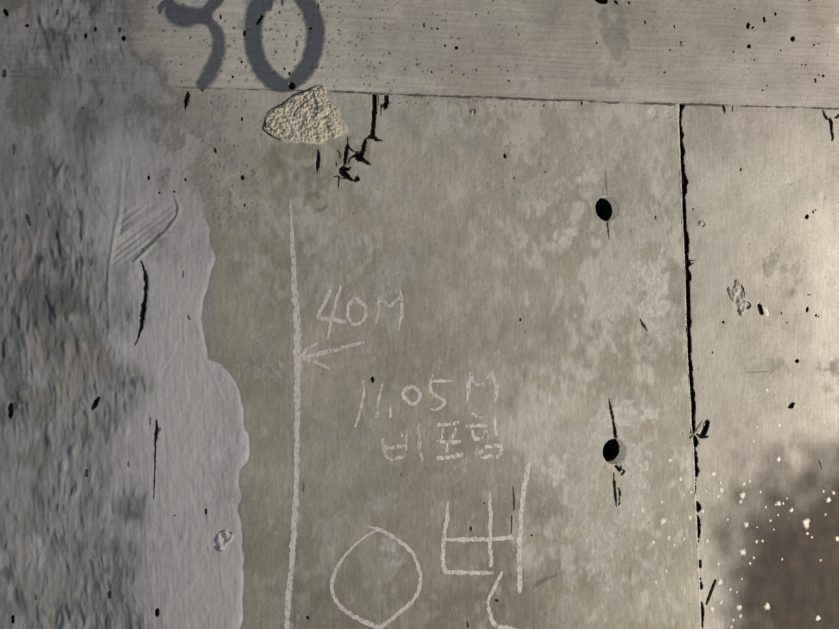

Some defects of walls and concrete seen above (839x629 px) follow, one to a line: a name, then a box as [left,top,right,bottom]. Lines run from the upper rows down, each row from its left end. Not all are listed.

crack [135,260,147,345]
crack [248,85,839,629]
water stain [733,454,839,629]